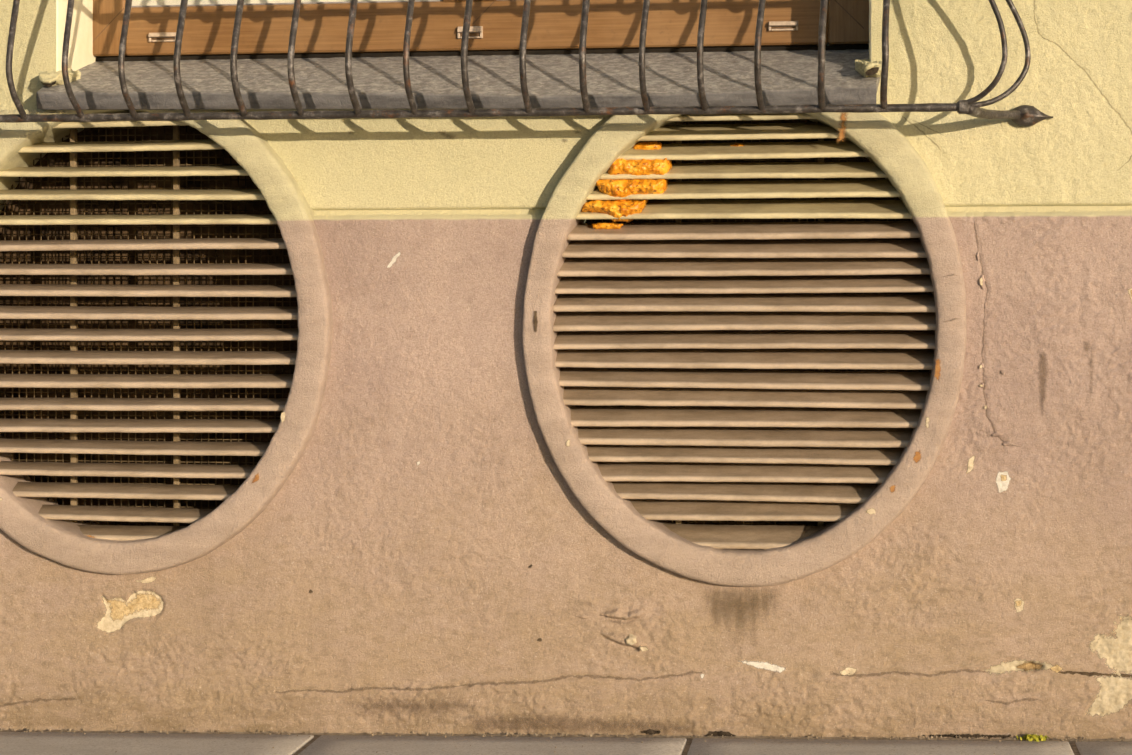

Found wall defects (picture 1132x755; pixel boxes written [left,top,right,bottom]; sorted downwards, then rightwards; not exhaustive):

peeling [97,576,164,633]
spalling [1087,616,1132,716]